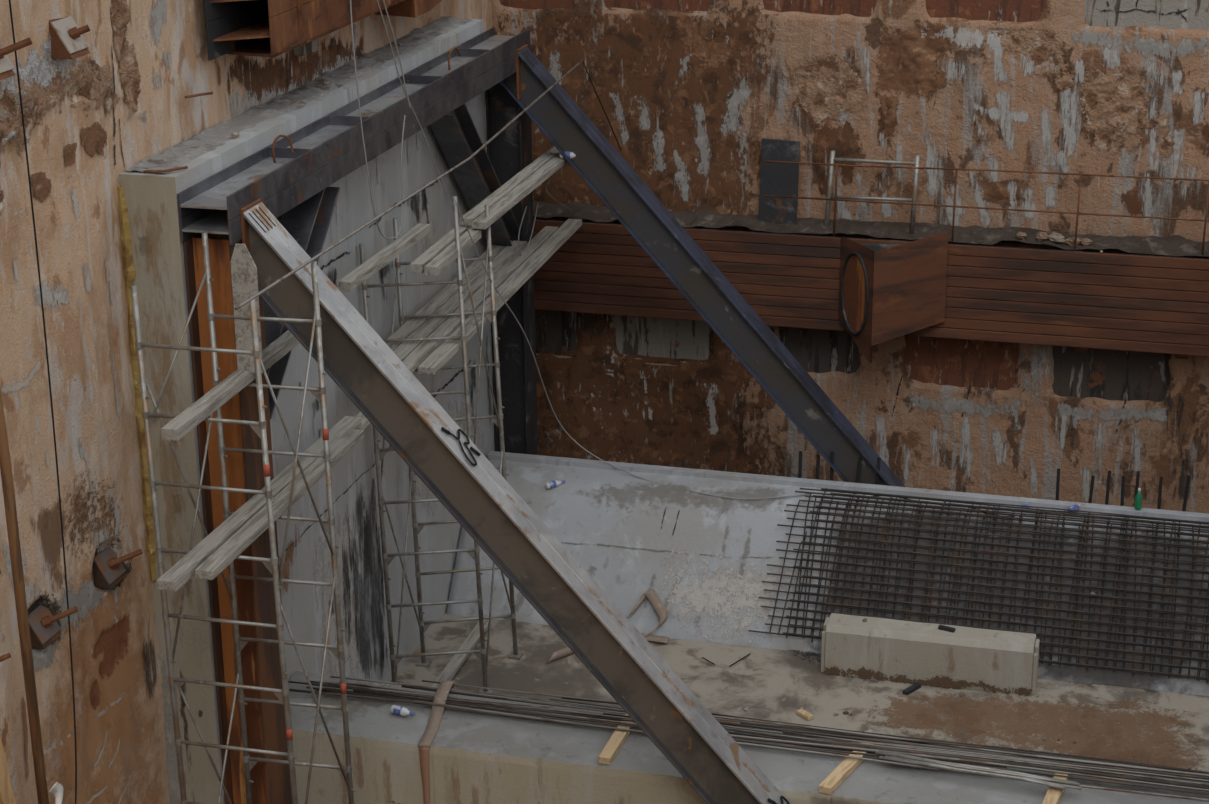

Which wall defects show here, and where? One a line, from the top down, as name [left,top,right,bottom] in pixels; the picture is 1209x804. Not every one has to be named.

spalling [31,172,52,202]
spalling [0,0,147,167]
water stain [832,24,1085,228]
water stain [1072,28,1207,221]
crack [1097,0,1190,22]
spalling [90,613,131,709]
water stain [313,479,388,679]